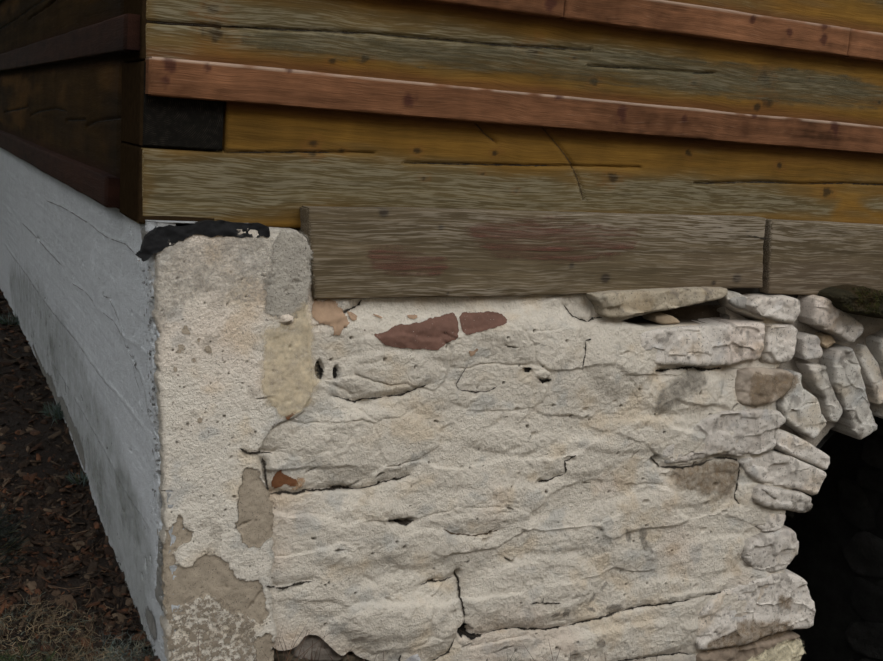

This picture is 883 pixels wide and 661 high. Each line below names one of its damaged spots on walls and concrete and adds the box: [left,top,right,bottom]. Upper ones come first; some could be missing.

peeling [139,229,357,336]
peeling [177,325,212,353]
spalling [364,311,507,350]
crack [240,448,410,495]
crack [538,455,576,482]
peeling [235,468,276,548]
crack [389,518,414,526]
crack [444,528,497,536]
peeling [145,516,369,661]
crack [267,581,312,590]
crack [421,570,721,661]